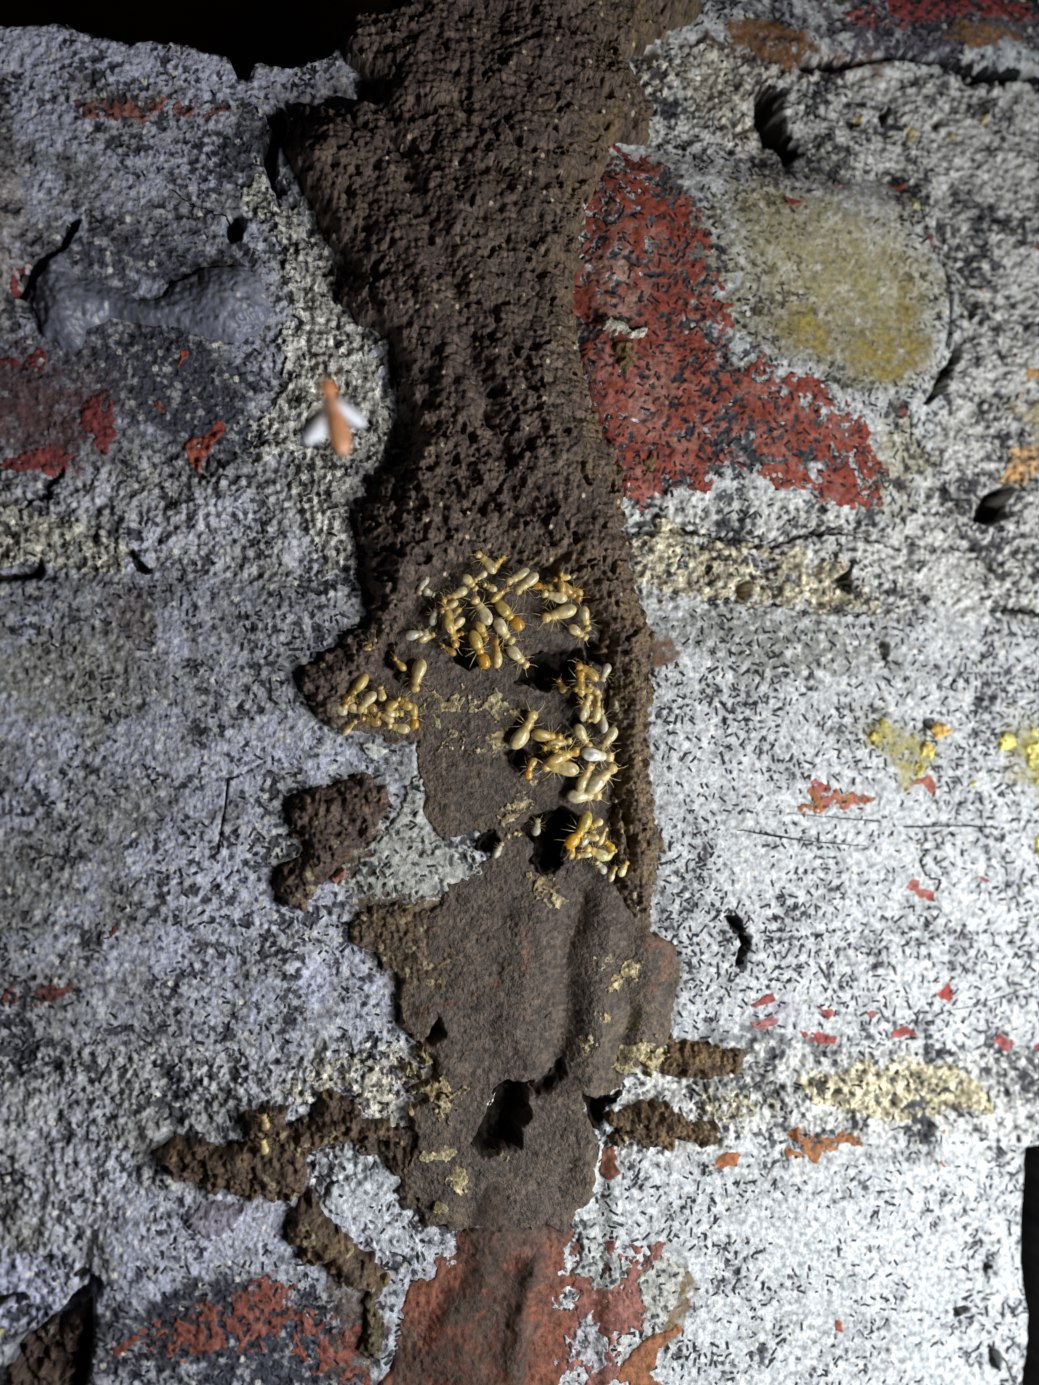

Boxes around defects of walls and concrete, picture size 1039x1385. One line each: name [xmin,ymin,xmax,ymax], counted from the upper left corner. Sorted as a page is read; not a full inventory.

peeling [569,144,890,615]
crack [938,258,954,351]